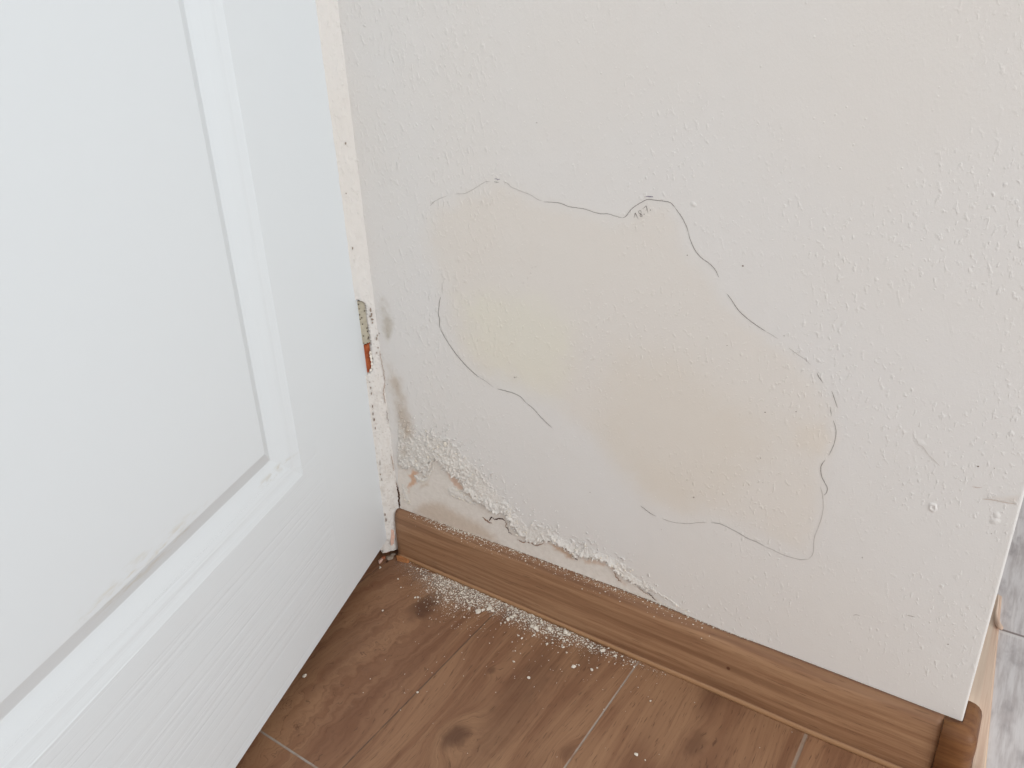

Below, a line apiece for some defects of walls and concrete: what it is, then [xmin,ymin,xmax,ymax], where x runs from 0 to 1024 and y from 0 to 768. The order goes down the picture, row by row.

spalling [397,460,666,604]
leakage [415,170,845,560]